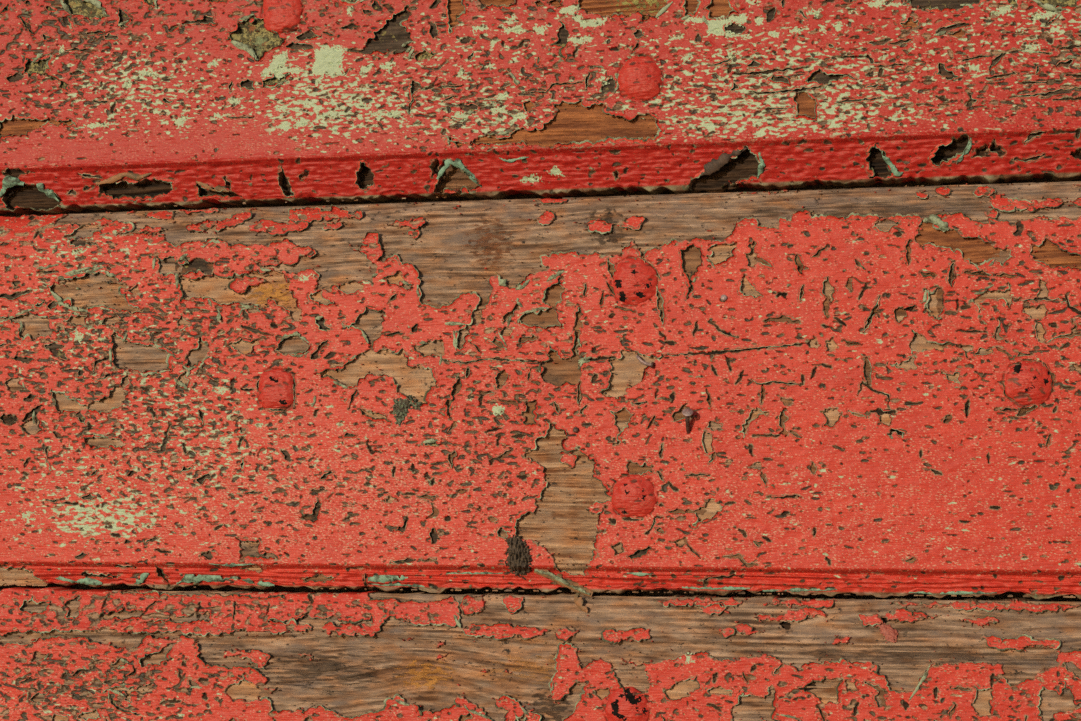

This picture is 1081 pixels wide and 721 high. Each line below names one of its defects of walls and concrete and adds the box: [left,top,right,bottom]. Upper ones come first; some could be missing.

peeling [60,0,158,28]
peeling [213,14,347,120]
peeling [359,0,1020,74]
peeling [1014,0,1081,75]
peeling [0,68,1081,454]
crack [582,232,1081,515]
crack [610,389,771,581]
peeling [0,400,1081,721]
crack [904,556,917,564]
crack [295,596,313,622]
crack [170,661,208,703]
crack [708,664,826,721]